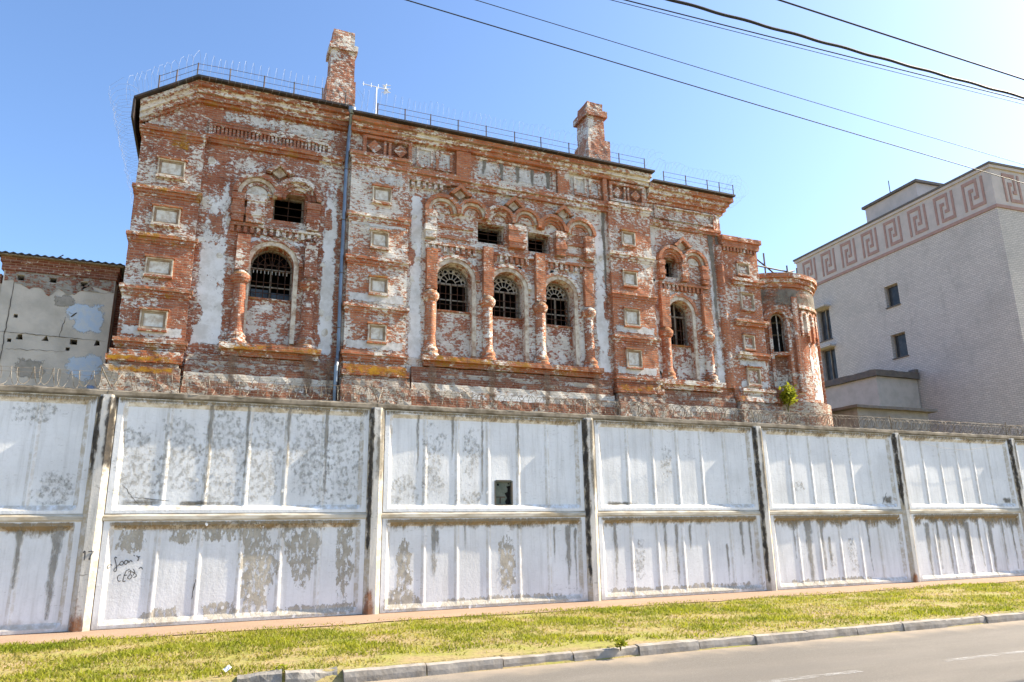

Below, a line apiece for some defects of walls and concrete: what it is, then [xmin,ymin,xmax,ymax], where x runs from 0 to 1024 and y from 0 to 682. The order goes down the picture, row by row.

peeling [221,111,340,142]
peeling [477,160,547,187]
spalling [198,213,231,245]
peeling [120,295,203,338]
peeling [603,297,655,336]
water stain [0,353,1024,509]
water stain [12,531,22,587]
water stain [45,527,64,619]
peeling [168,520,355,622]
peeling [381,536,573,611]
water stain [792,521,832,580]
water stain [923,518,1019,574]